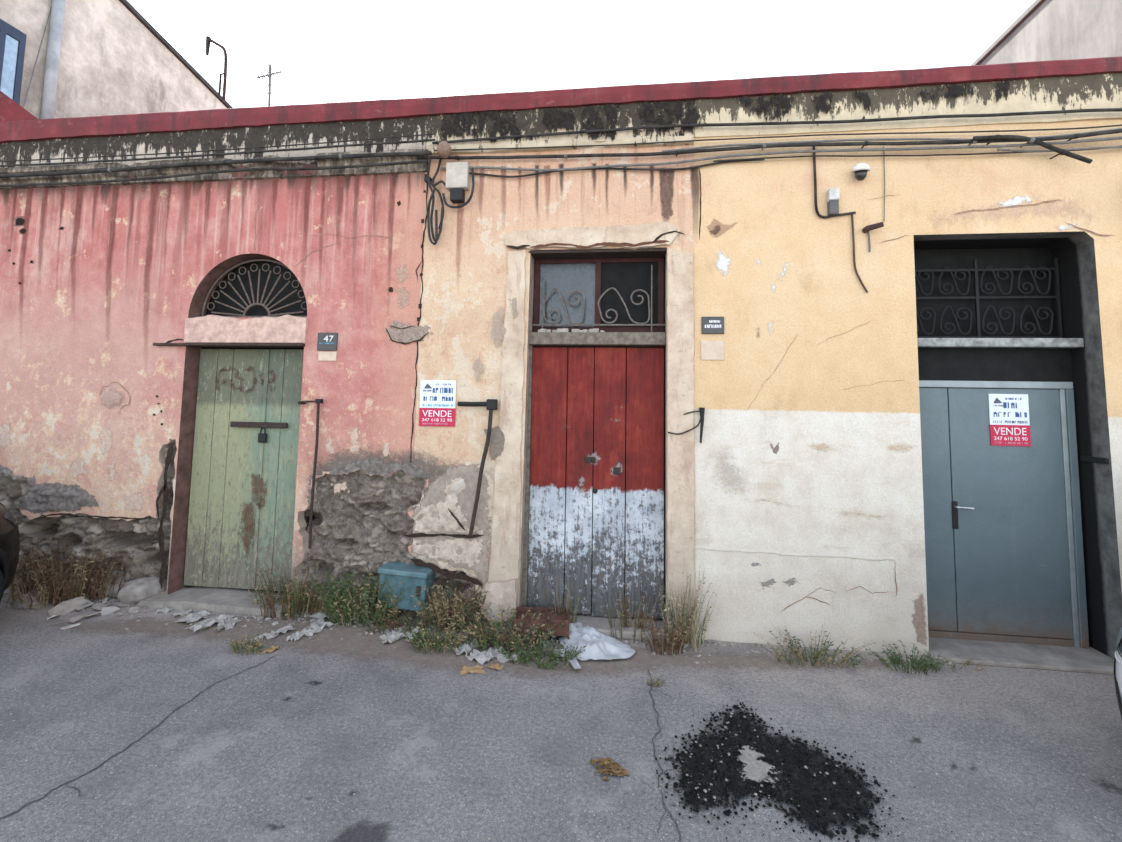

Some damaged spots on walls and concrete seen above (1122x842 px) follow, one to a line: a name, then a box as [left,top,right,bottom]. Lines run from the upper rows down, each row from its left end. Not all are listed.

damp [441,110,520,143]
damp [542,103,621,141]
damp [728,93,794,121]
damp [691,168,699,199]
damp [60,183,171,275]
spalling [708,219,735,237]
spalling [956,196,1115,236]
spalling [0,439,177,594]
spalling [298,426,518,623]
crack [781,572,897,612]
crack [0,657,272,819]
crack [648,668,681,842]